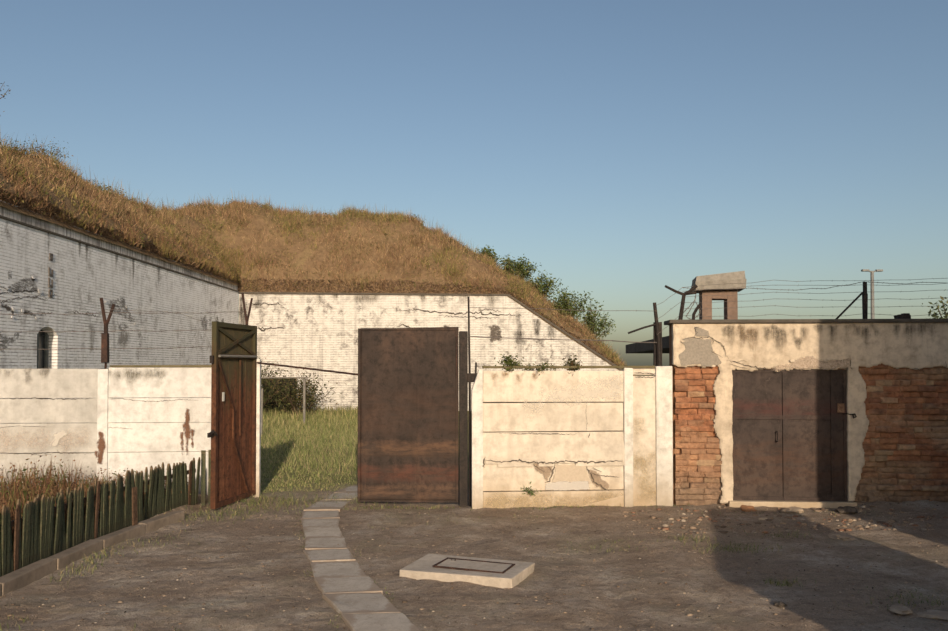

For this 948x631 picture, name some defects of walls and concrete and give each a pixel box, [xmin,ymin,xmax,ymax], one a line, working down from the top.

peeling [5,272,42,294]
peeling [0,303,38,319]
crack [396,309,519,328]
corrosion [95,432,105,464]
corrosion [180,409,194,455]
flaking render [674,327,727,506]
flaking render [775,356,948,504]
spalling [534,464,609,490]